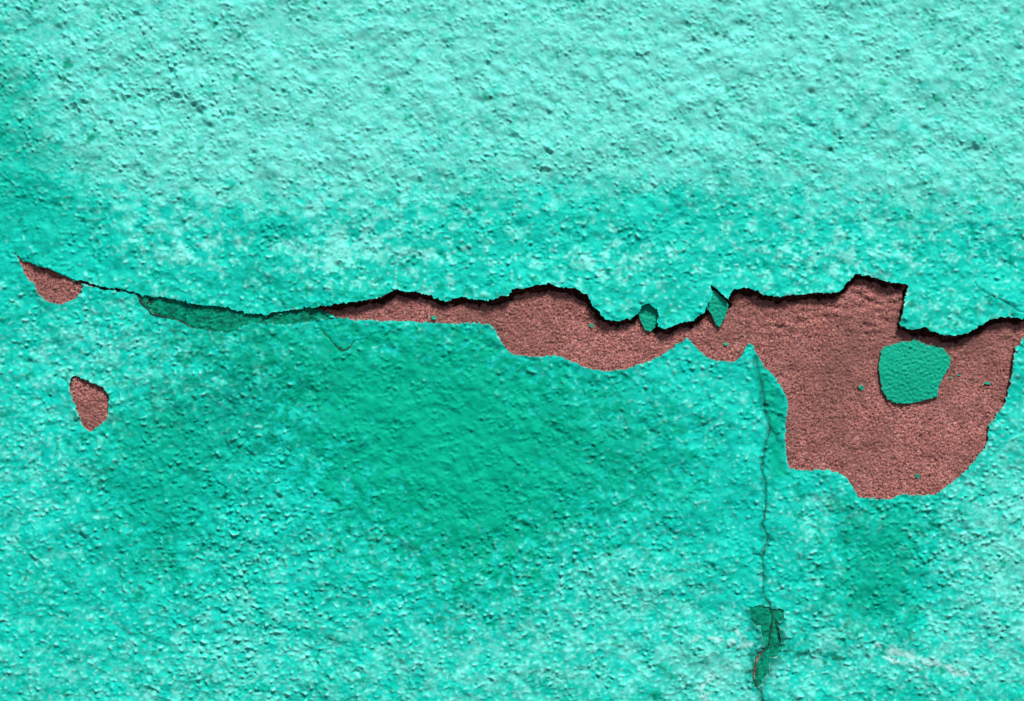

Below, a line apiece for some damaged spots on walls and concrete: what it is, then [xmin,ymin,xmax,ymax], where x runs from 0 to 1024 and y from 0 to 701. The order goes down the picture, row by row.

peeling [15,253,96,305]
crack [76,280,192,328]
peeling [70,376,110,431]
peeling [133,274,1024,499]
crack [752,357,780,701]